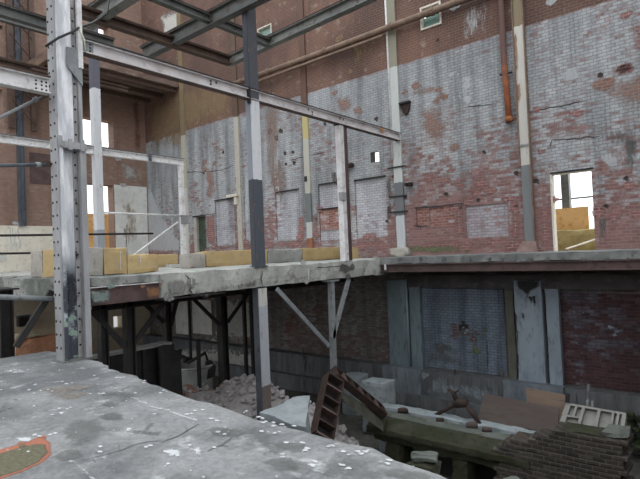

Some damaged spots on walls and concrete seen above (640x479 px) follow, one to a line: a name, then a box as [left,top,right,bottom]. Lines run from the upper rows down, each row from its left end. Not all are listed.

peeling [402,82,449,104]
crack [514,101,583,116]
peeling [592,62,640,101]
crack [549,136,599,149]
peeling [202,160,216,197]
peeling [590,175,640,224]
peeling [205,215,251,251]
peeling [265,210,306,247]
crack [59,424,198,467]